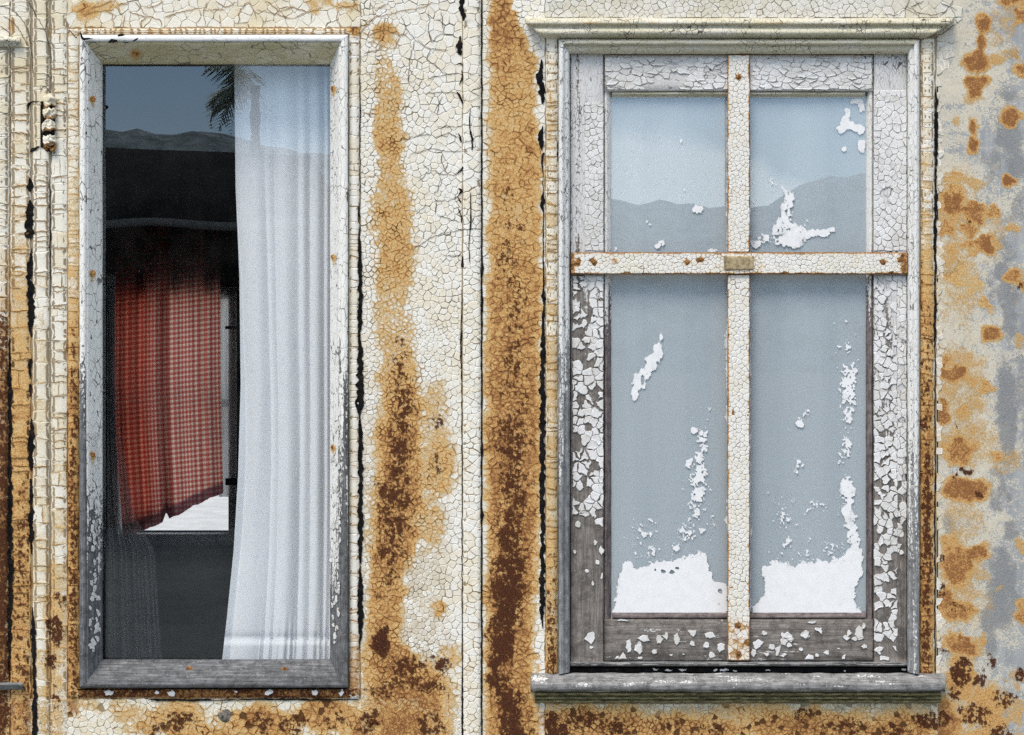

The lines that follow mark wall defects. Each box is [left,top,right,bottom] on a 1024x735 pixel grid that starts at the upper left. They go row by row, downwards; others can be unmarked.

peeling [88,431,102,652]
rust [0,0,462,735]
crack [1,0,484,735]
peeling [572,275,604,528]
peeling [615,630,737,672]
rust [482,0,1024,735]
peeling [750,275,907,672]
crack [932,87,940,672]